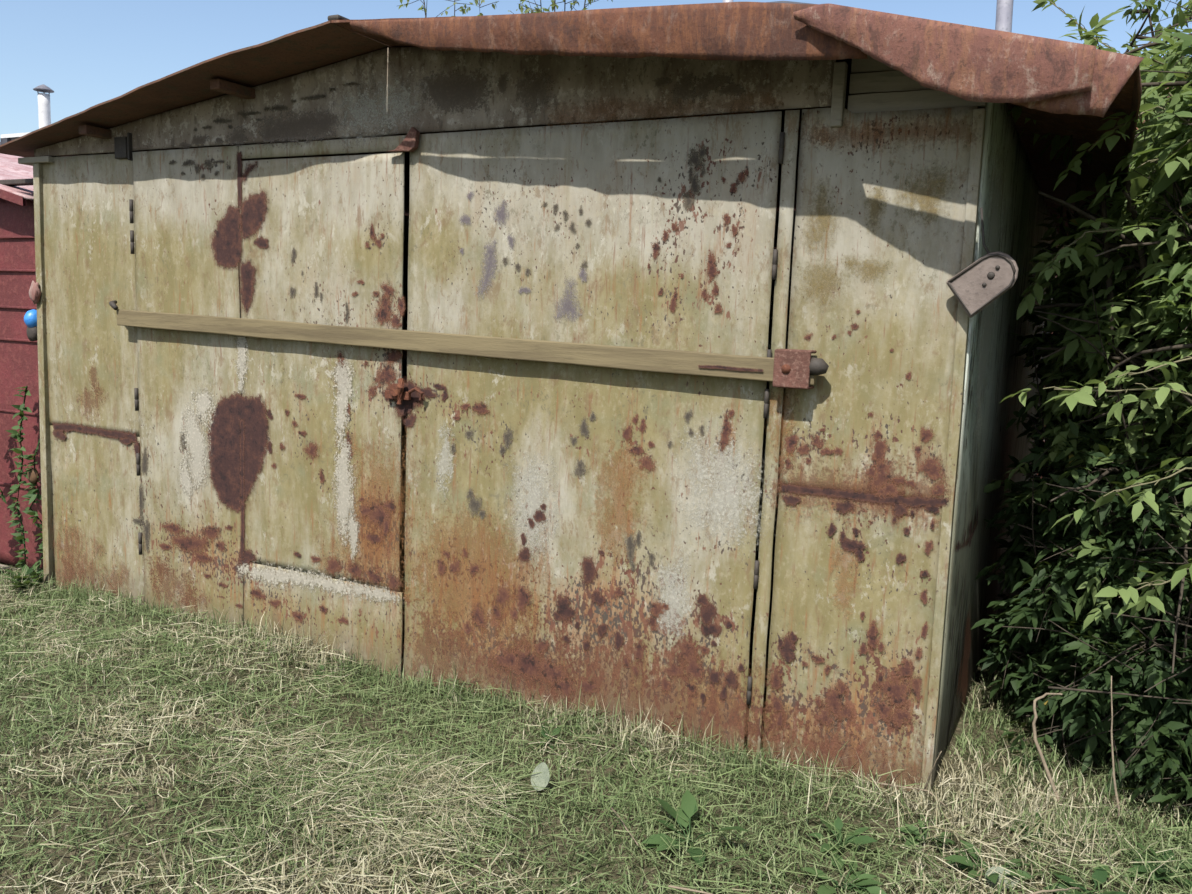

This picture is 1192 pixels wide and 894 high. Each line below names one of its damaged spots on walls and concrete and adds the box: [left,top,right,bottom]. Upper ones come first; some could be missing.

corrosion [647,223,679,269]
corrosion [723,213,737,248]
corrosion [363,349,448,428]
corrosion [450,401,490,453]
corrosion [518,504,546,562]
corrosion [778,426,949,562]
corrosion [581,550,624,606]
corrosion [553,593,668,678]
corrosion [660,594,744,703]
corrosion [769,631,852,727]
corrosion [858,612,886,654]
corrosion [872,622,928,730]